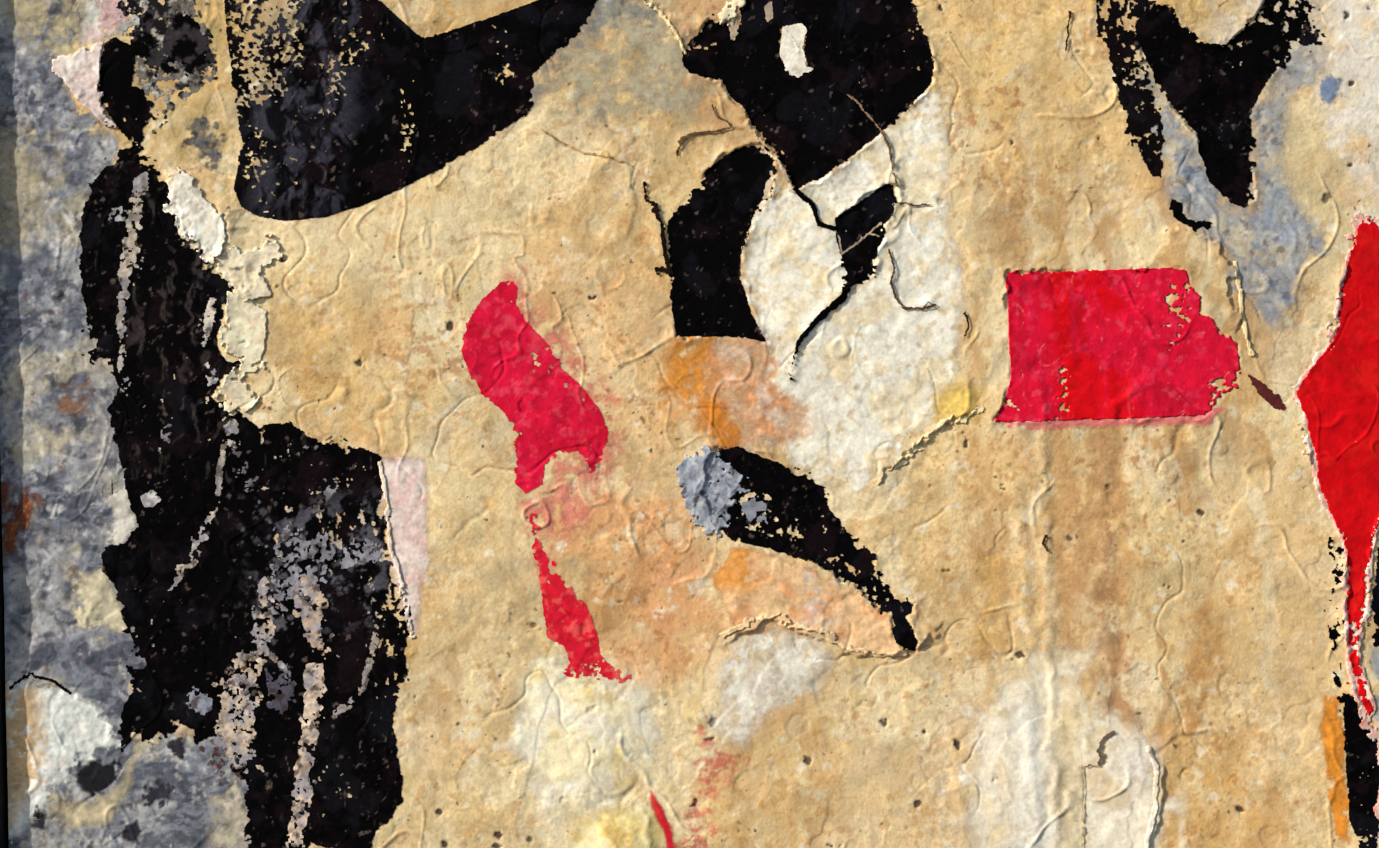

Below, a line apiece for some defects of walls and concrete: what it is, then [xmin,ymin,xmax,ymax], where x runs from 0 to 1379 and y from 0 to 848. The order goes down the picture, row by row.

crack [541,129,674,275]
crack [677,94,969,380]